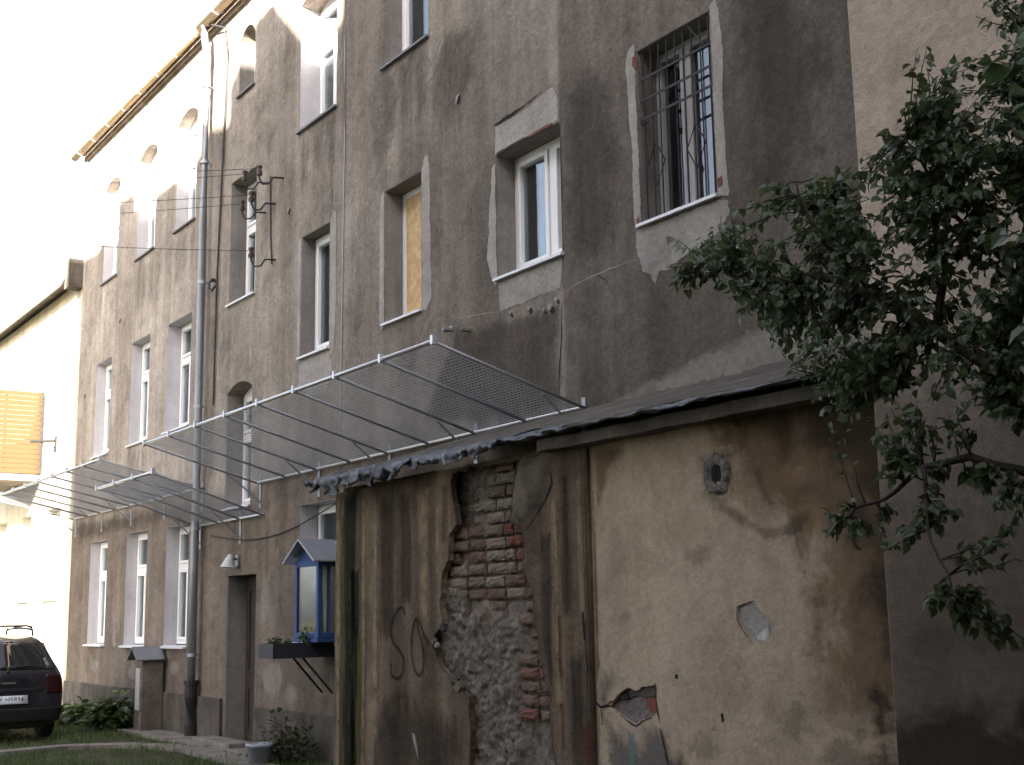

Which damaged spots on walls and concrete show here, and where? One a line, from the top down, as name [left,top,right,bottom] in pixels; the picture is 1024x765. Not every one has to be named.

crack [558,260,633,385]
leakage [736,401,883,545]
spalling [430,461,557,765]
flaking render [736,601,774,646]
spalling [606,683,660,727]